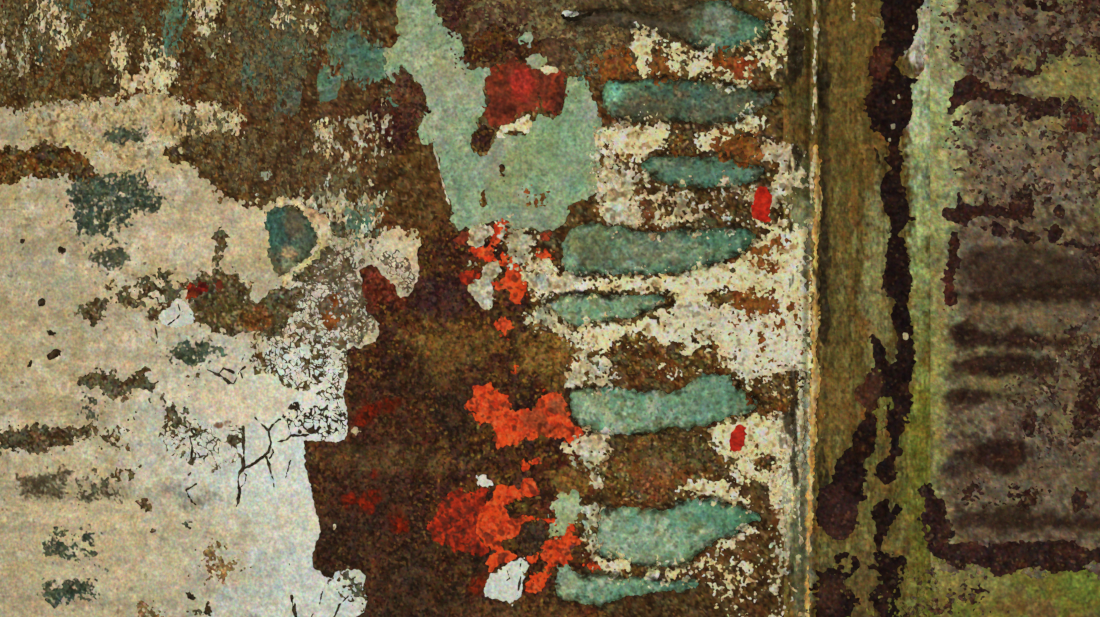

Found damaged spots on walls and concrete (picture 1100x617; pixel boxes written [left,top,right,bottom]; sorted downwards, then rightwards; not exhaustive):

peeling [518,10,609,81]
rust [518,184,550,208]
peeling [158,298,195,328]
leakage [950,323,1078,378]
crack [158,245,417,507]
leakage [945,390,991,405]
peeling [718,424,747,462]
leakage [974,439,1027,475]
rust [503,494,555,556]
leakage [953,507,1100,532]
rust [327,564,375,612]
peeling [680,553,752,610]